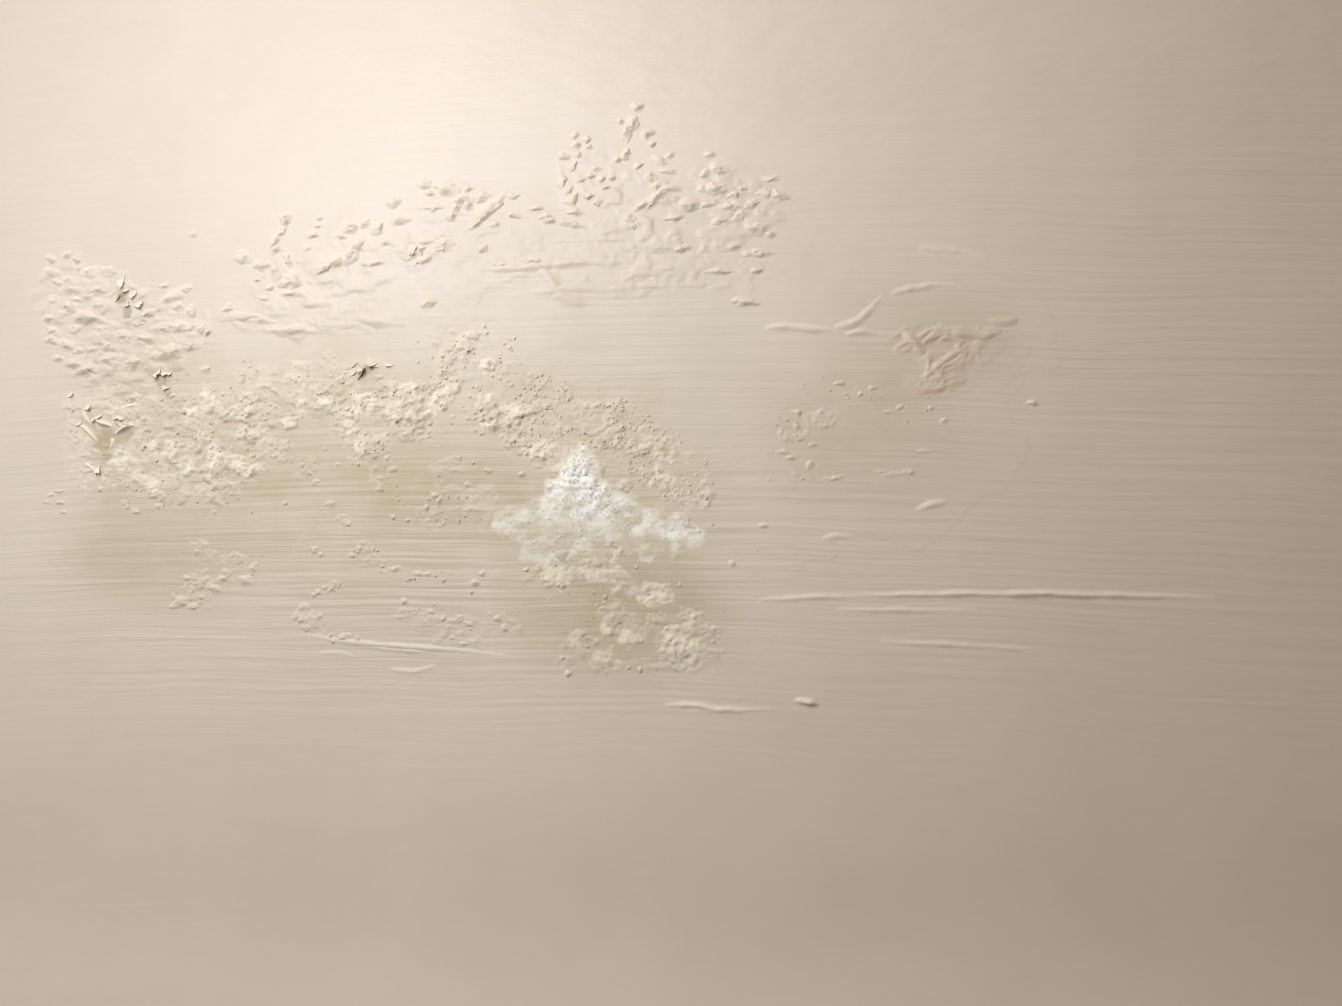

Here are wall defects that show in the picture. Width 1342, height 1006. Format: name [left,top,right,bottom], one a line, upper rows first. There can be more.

peeling [146,363,185,400]
peeling [338,358,395,383]
peeling [59,391,137,493]
leakage [10,152,819,719]
peeling [169,537,264,611]
spalling [521,538,726,688]